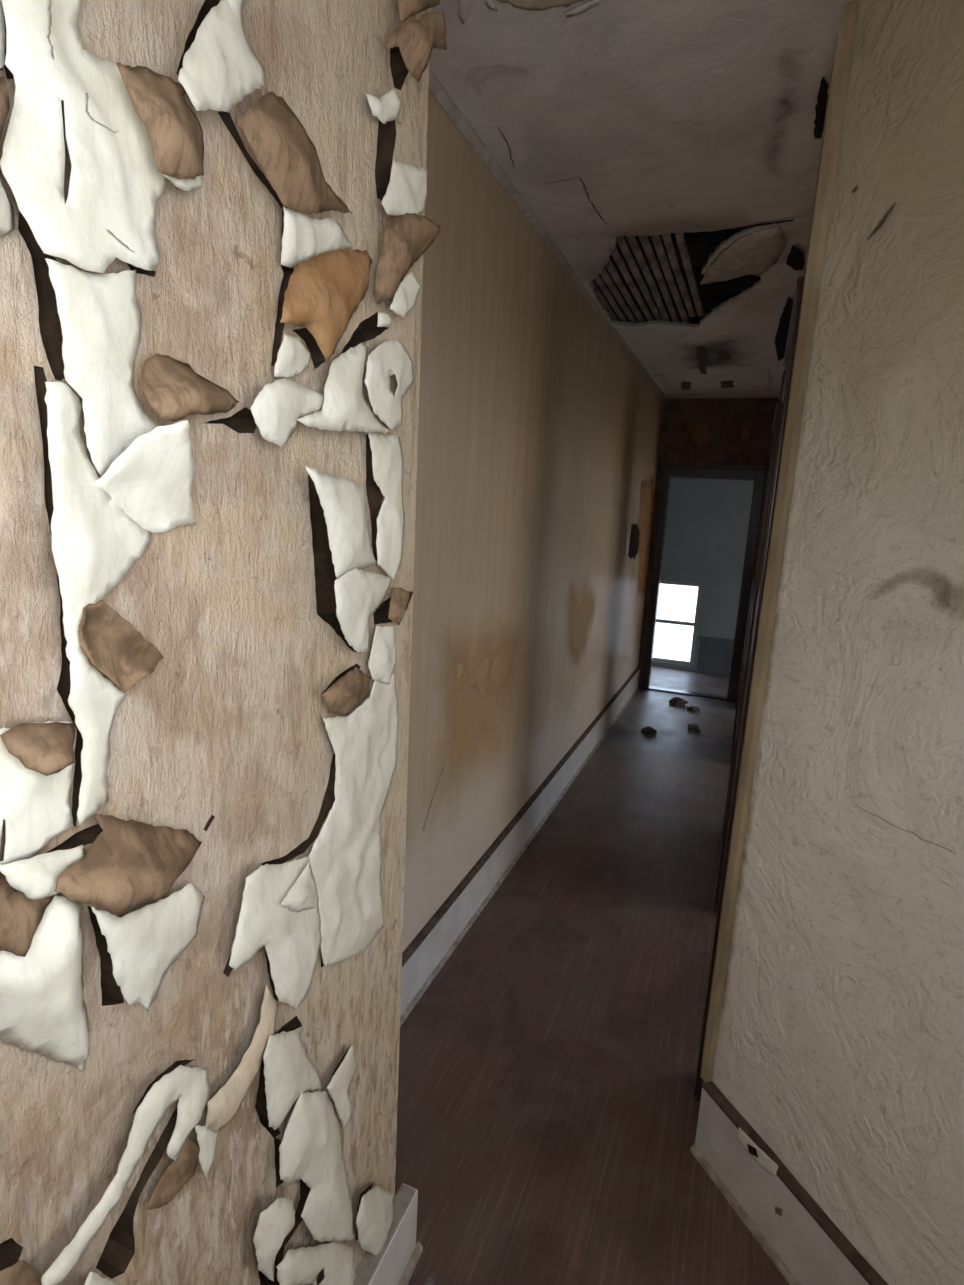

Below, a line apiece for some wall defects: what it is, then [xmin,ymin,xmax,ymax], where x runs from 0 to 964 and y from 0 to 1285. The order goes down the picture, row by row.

spalling [458,0,602,25]